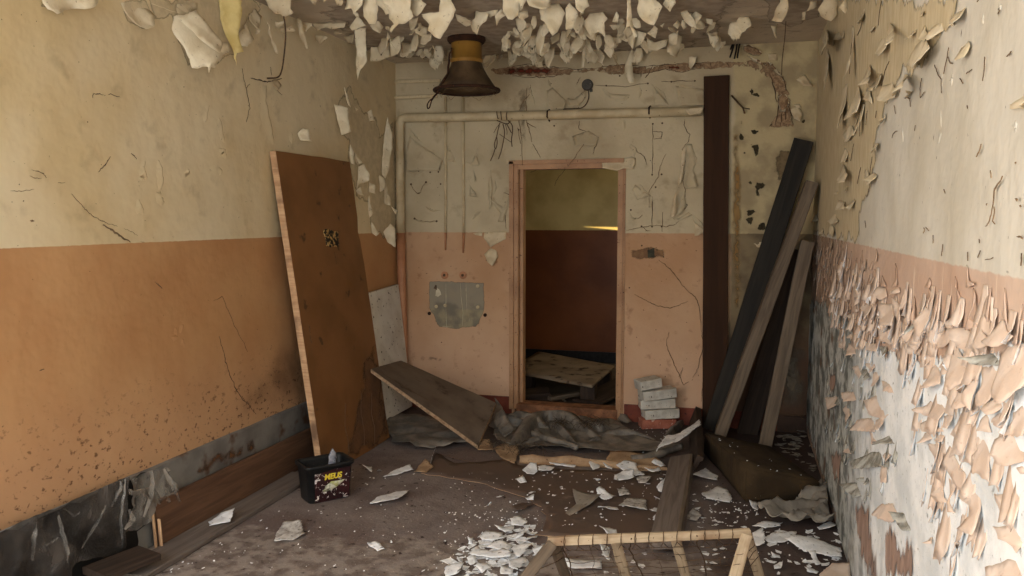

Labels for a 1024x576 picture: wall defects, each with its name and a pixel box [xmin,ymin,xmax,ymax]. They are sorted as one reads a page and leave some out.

peeling [42,0,99,14]
peeling [121,0,802,128]
peeling [298,129,312,142]
peeling [334,86,509,266]
peeling [602,144,653,173]
peeling [632,121,703,236]
peeling [765,0,1024,576]
crack [217,296,256,414]